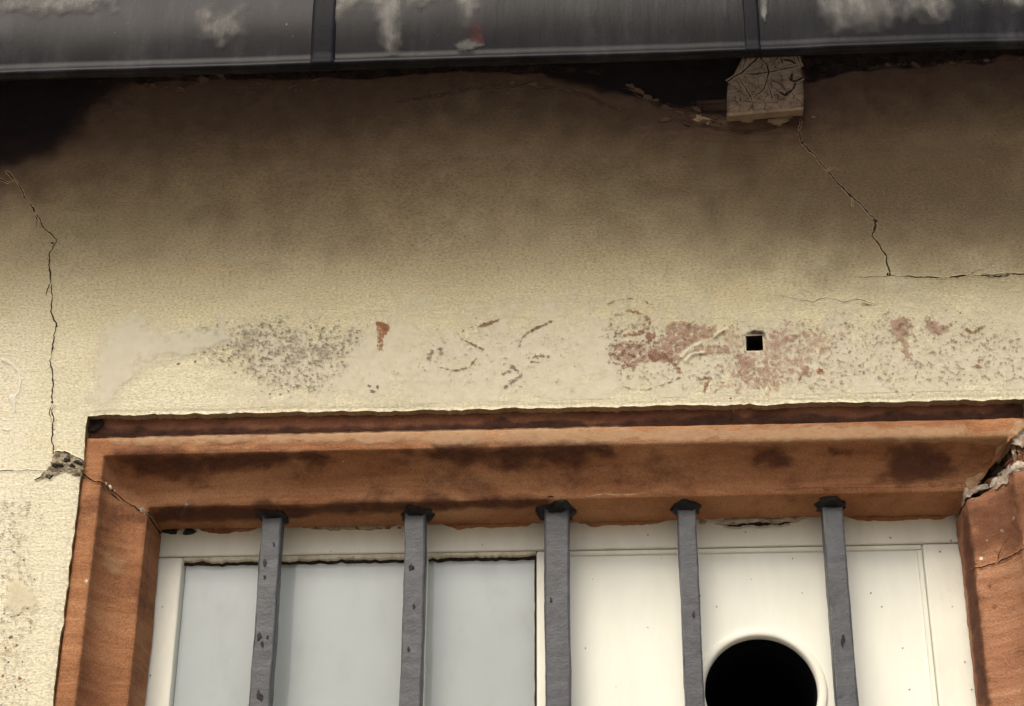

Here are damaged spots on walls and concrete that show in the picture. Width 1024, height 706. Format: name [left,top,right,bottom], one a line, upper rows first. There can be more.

damp [0,64,729,177]
damp [768,54,1024,136]
crack [780,120,1024,306]
crack [0,170,59,473]
peeling [597,309,1024,399]
spalling [34,450,84,482]
crack [83,471,151,517]
damp [426,439,613,469]
spalling [772,412,1024,507]
damp [890,446,950,483]